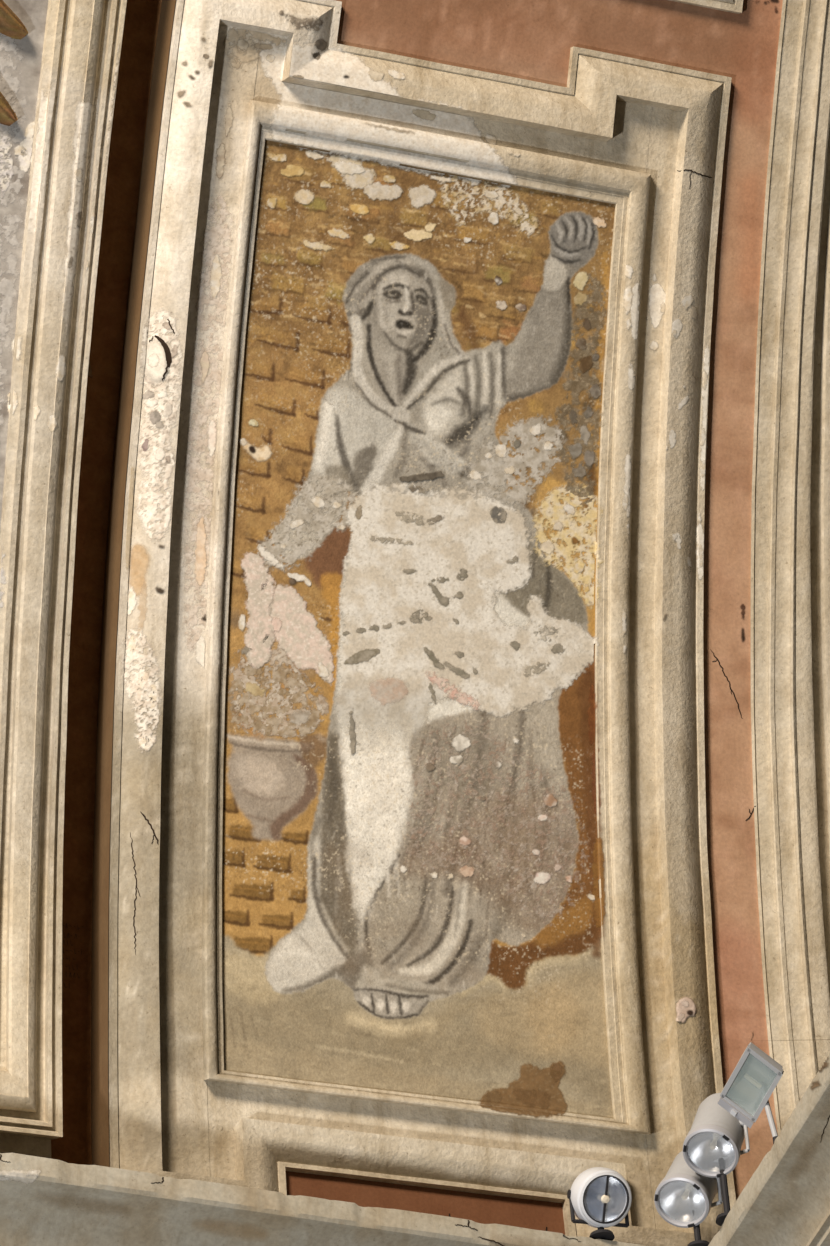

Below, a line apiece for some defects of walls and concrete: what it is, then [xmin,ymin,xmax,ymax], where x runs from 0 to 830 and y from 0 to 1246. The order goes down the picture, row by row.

peeling [224,10,539,243]
peeling [303,228,375,251]
peeling [389,223,436,250]
peeling [496,301,526,311]
peeling [573,272,588,290]
crack [149,319,175,381]
peeling [228,417,603,917]
crack [710,649,743,719]
leakage [579,673,605,956]
crack [130,812,159,954]
leakage [480,1061,567,1117]